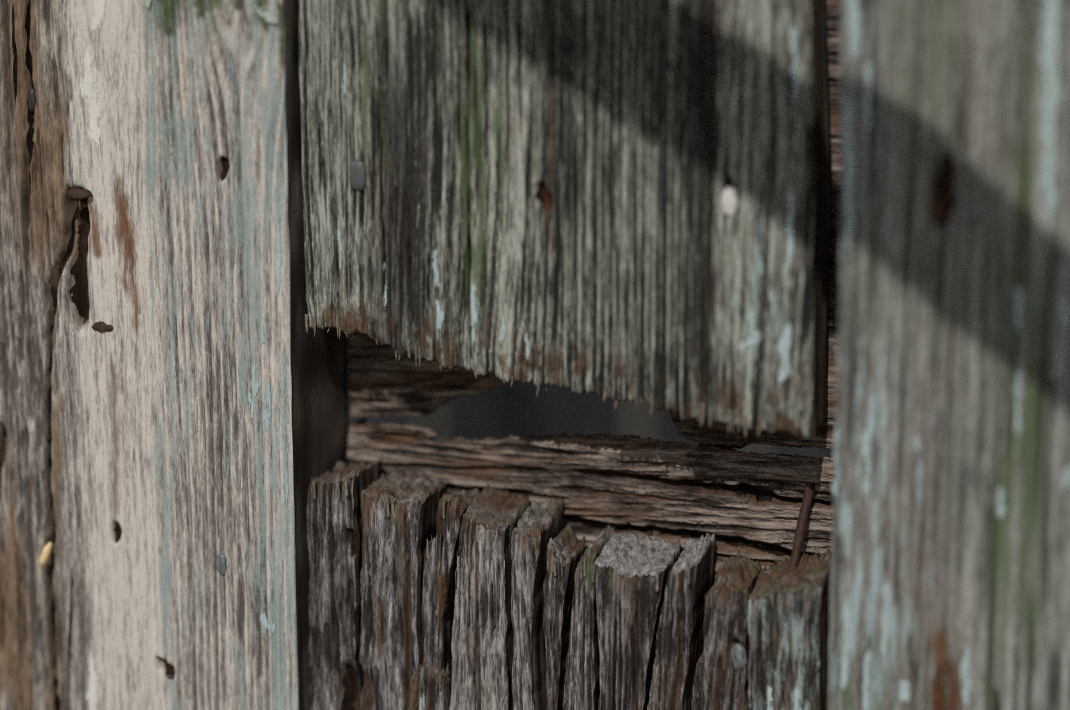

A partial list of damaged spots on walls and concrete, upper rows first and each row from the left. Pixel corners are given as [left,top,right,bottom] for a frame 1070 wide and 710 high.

crack [12,0,35,227]
corrosion [88,203,100,257]
corrosion [115,179,138,330]
corrosion [931,635,946,710]